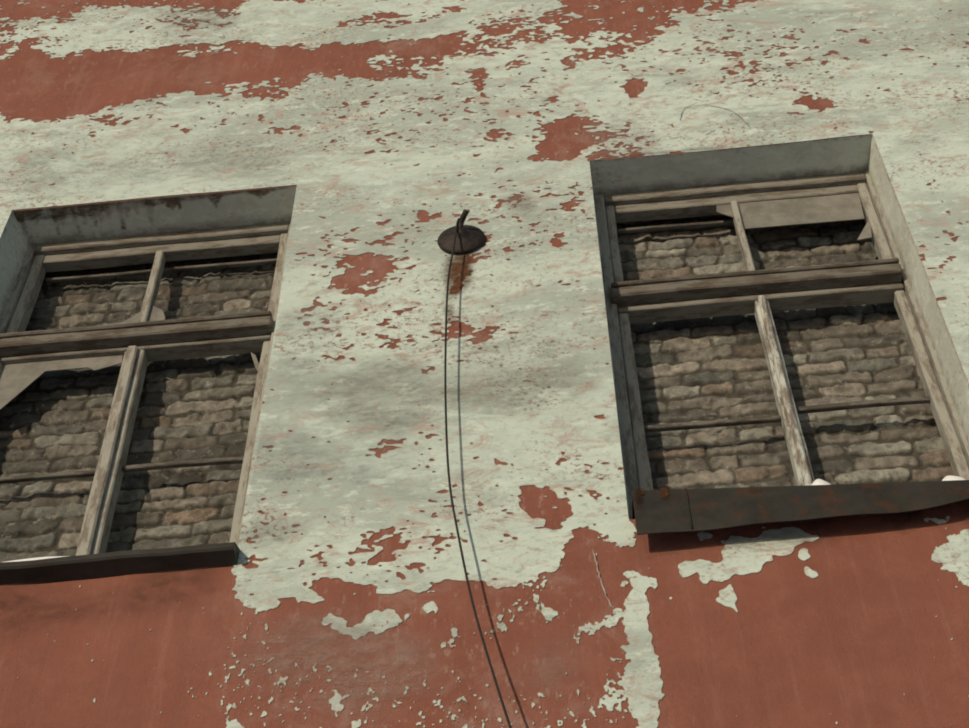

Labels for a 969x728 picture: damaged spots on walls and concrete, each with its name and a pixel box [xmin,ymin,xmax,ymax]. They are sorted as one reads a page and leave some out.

peeling [367,50,404,71]
peeling [678,527,819,613]
peeling [924,516,969,588]
peeling [217,641,395,728]
peeling [321,609,409,641]
peeling [393,570,665,728]